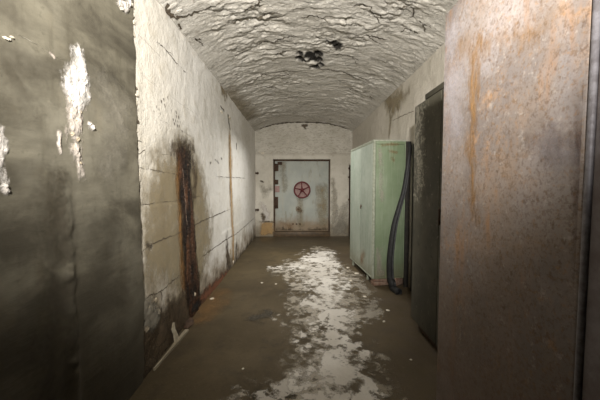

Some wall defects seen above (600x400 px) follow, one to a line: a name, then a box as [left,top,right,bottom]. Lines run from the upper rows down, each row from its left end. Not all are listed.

crack [173,0,276,24]
crack [352,4,387,45]
crack [397,6,430,33]
crack [231,35,297,90]
crack [321,54,372,100]
leakage [143,291,191,378]
leakage [250,246,392,400]